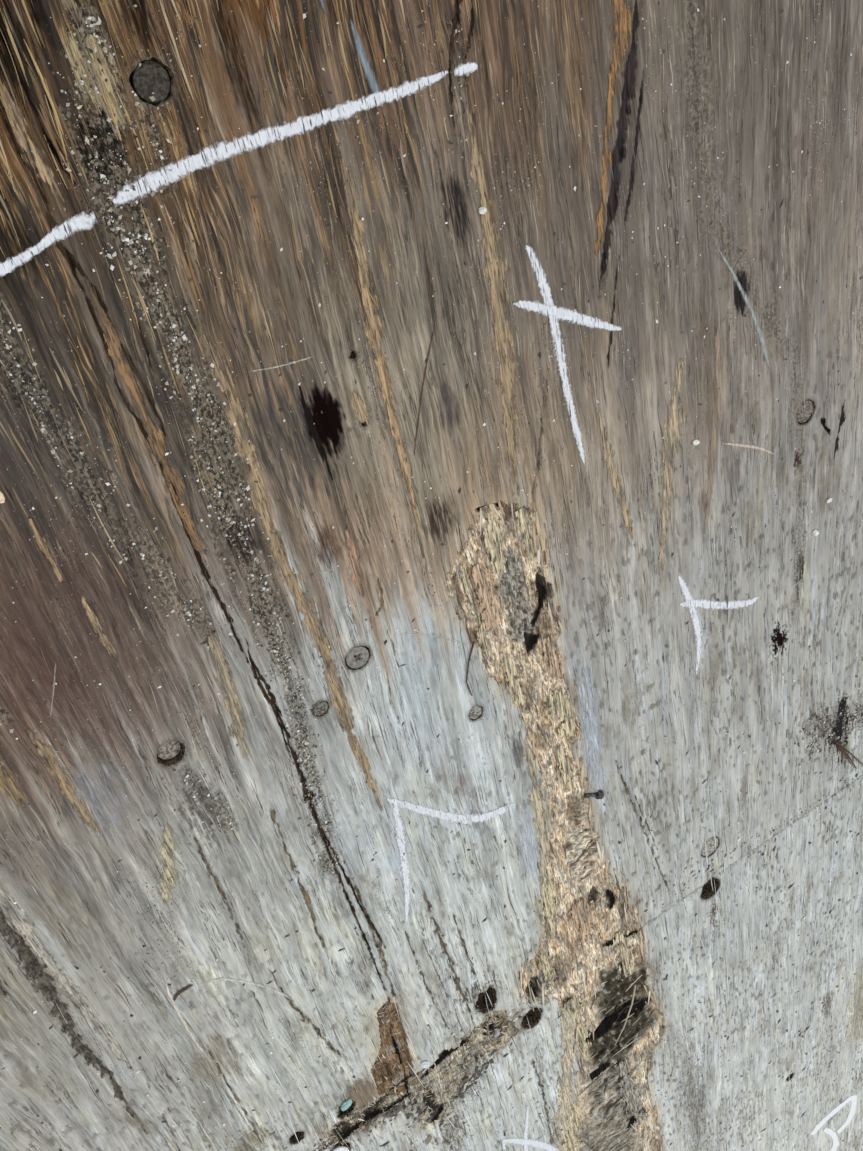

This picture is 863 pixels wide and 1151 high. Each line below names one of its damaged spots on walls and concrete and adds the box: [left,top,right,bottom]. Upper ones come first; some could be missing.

leakage [299,386,333,481]
peeling [344,167,421,534]
crack [598,0,644,367]
spalling [446,105,665,1151]
spalling [329,1001,521,1146]